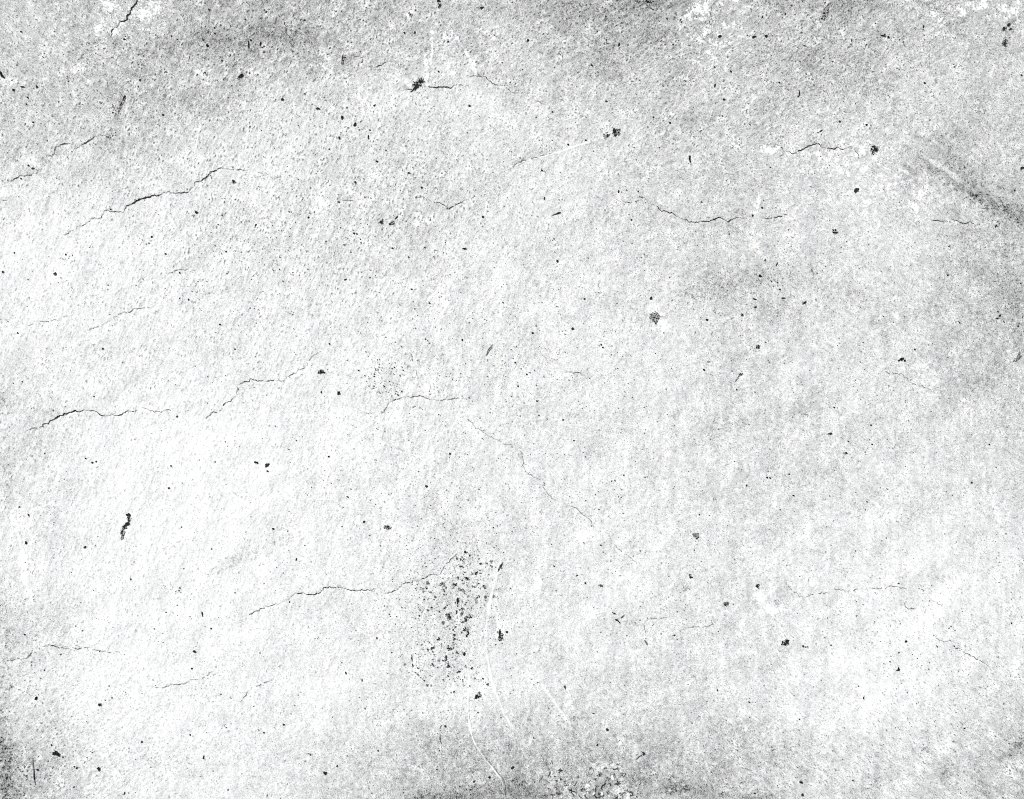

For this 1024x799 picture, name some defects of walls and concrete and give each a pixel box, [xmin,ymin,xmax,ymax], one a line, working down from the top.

crack [780,143,859,156]
crack [63,168,281,237]
crack [30,408,181,429]
crack [205,352,318,419]